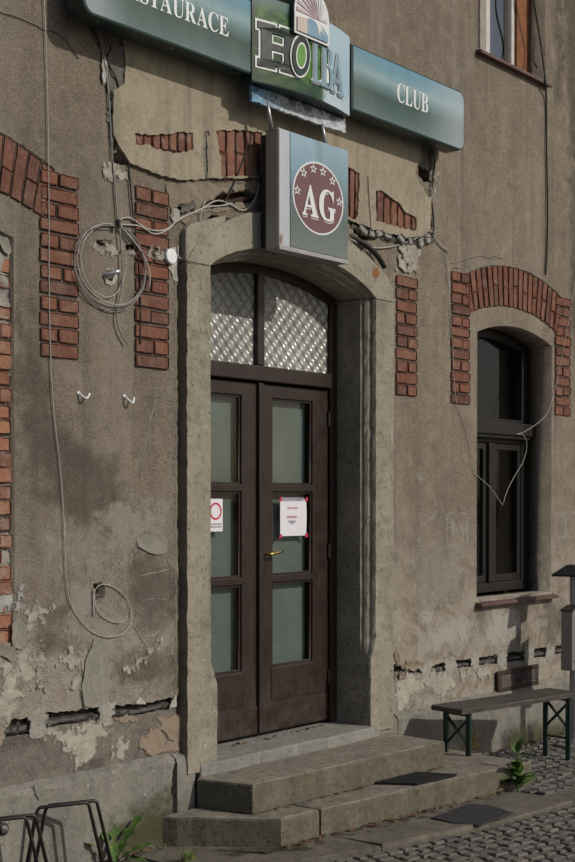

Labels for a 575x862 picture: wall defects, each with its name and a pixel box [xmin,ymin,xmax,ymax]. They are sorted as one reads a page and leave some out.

crack [0,11,79,59]
spalling [102,37,134,183]
flaking render [135,132,193,153]
spalling [166,130,261,225]
spalling [348,148,441,273]
spalling [147,244,178,281]
peeling [0,584,85,727]
peeling [123,637,163,674]
peeling [394,647,490,711]
peeling [43,695,182,772]